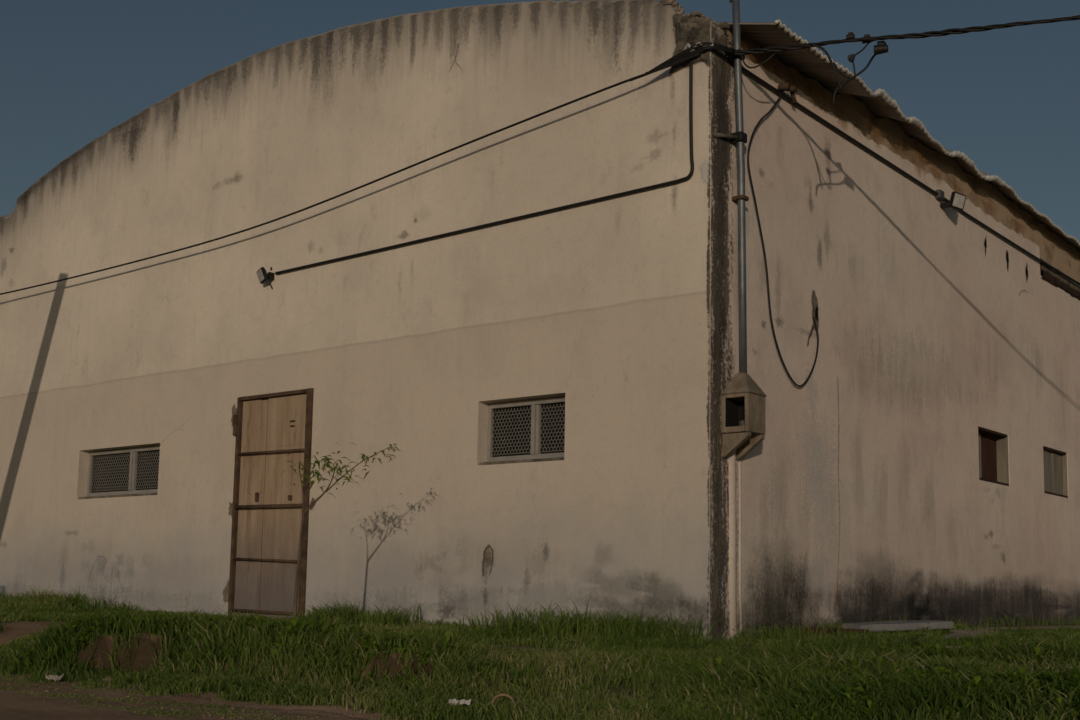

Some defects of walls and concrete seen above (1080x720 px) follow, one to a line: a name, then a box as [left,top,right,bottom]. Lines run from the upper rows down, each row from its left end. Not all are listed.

damp [841,594,1080,626]